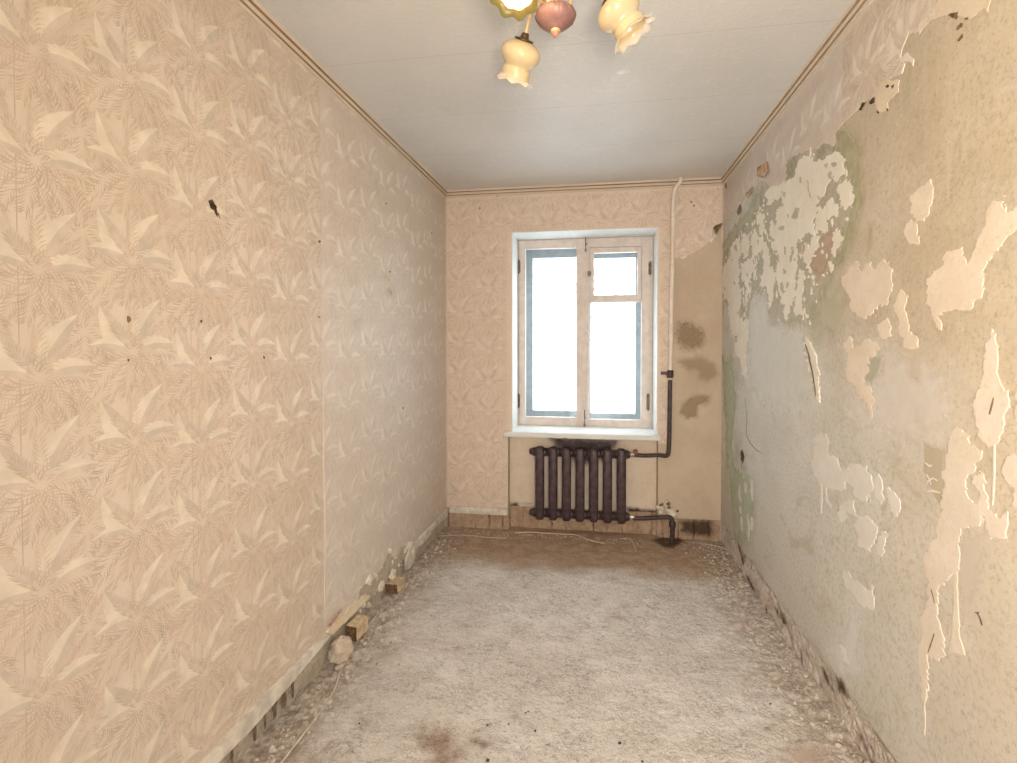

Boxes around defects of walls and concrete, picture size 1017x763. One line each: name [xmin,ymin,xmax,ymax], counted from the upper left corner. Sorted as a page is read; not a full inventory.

peeling [722,144,919,418]
peeling [903,179,934,245]
peeling [925,196,1017,330]
spalling [219,500,898,763]
peeling [811,432,901,557]
peeling [917,328,1017,735]